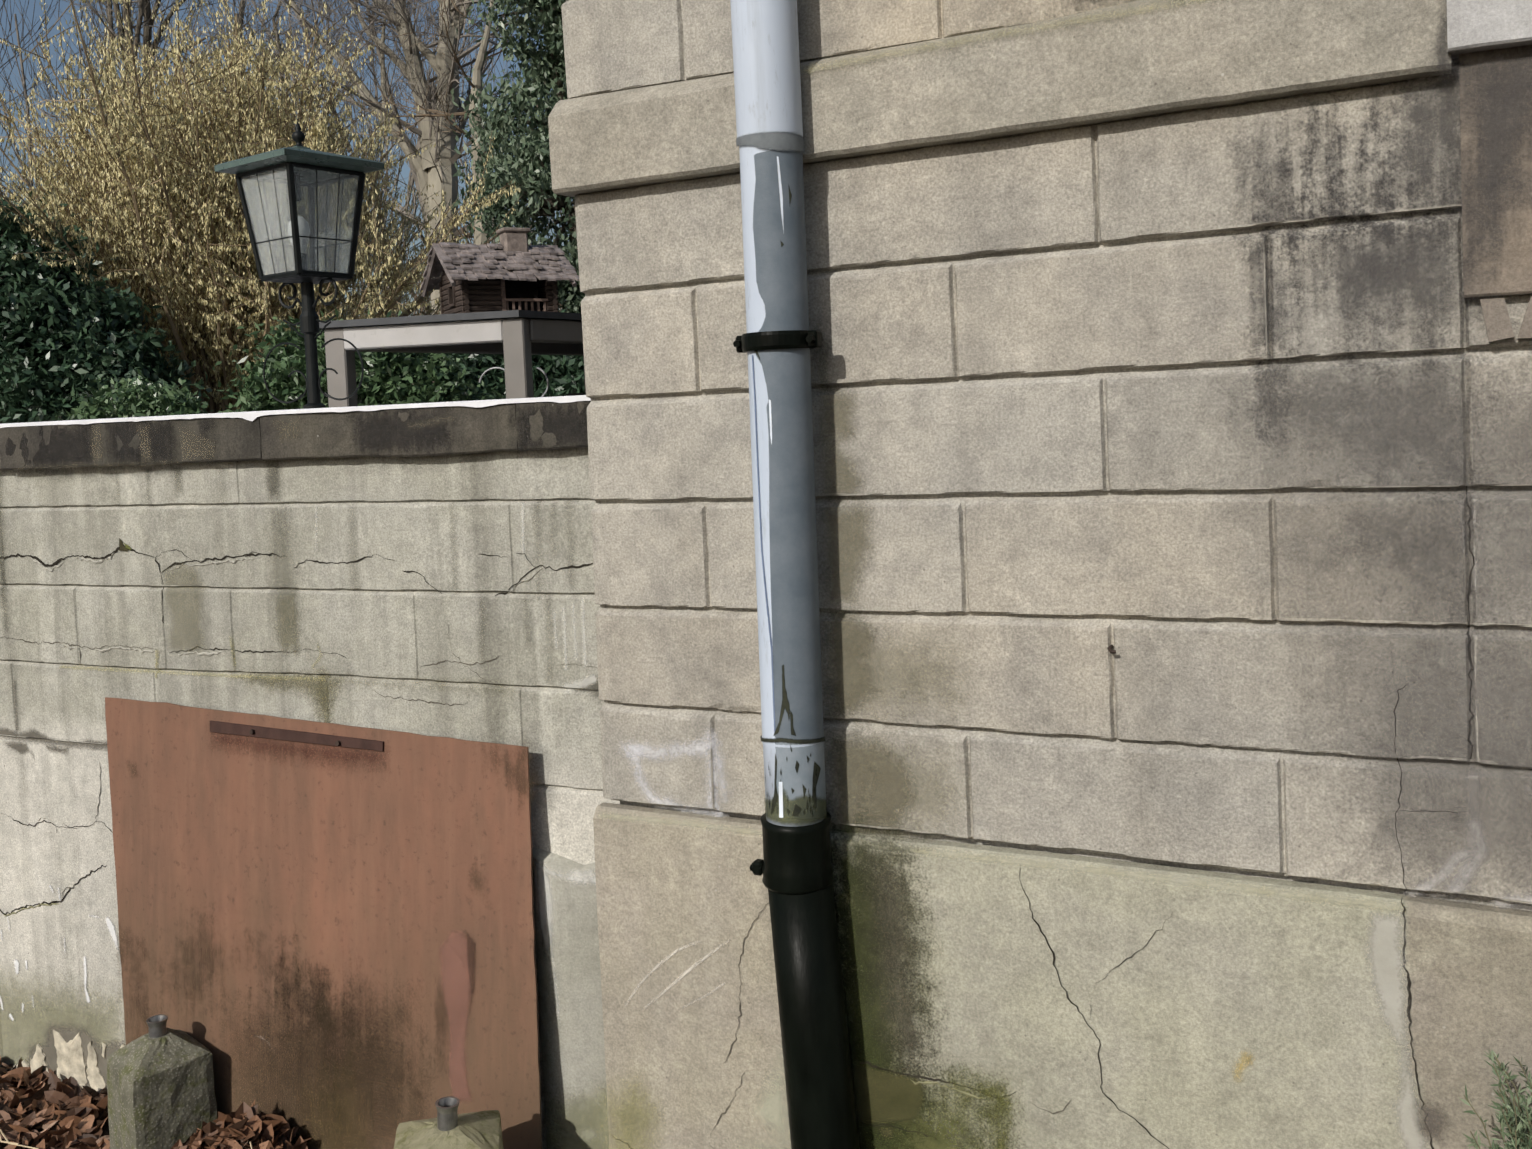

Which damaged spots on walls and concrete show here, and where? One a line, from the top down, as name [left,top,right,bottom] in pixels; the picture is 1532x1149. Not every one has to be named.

water stain [1289,70,1464,343]
water stain [107,420,174,466]
water stain [354,408,450,456]
water stain [518,403,588,450]
crack [0,547,497,706]
crack [481,553,593,597]
crack [0,768,112,917]
crack [1390,642,1467,1149]
crack [710,903,768,1149]
crack [852,865,1173,1149]
water stain [853,1066,1002,1149]